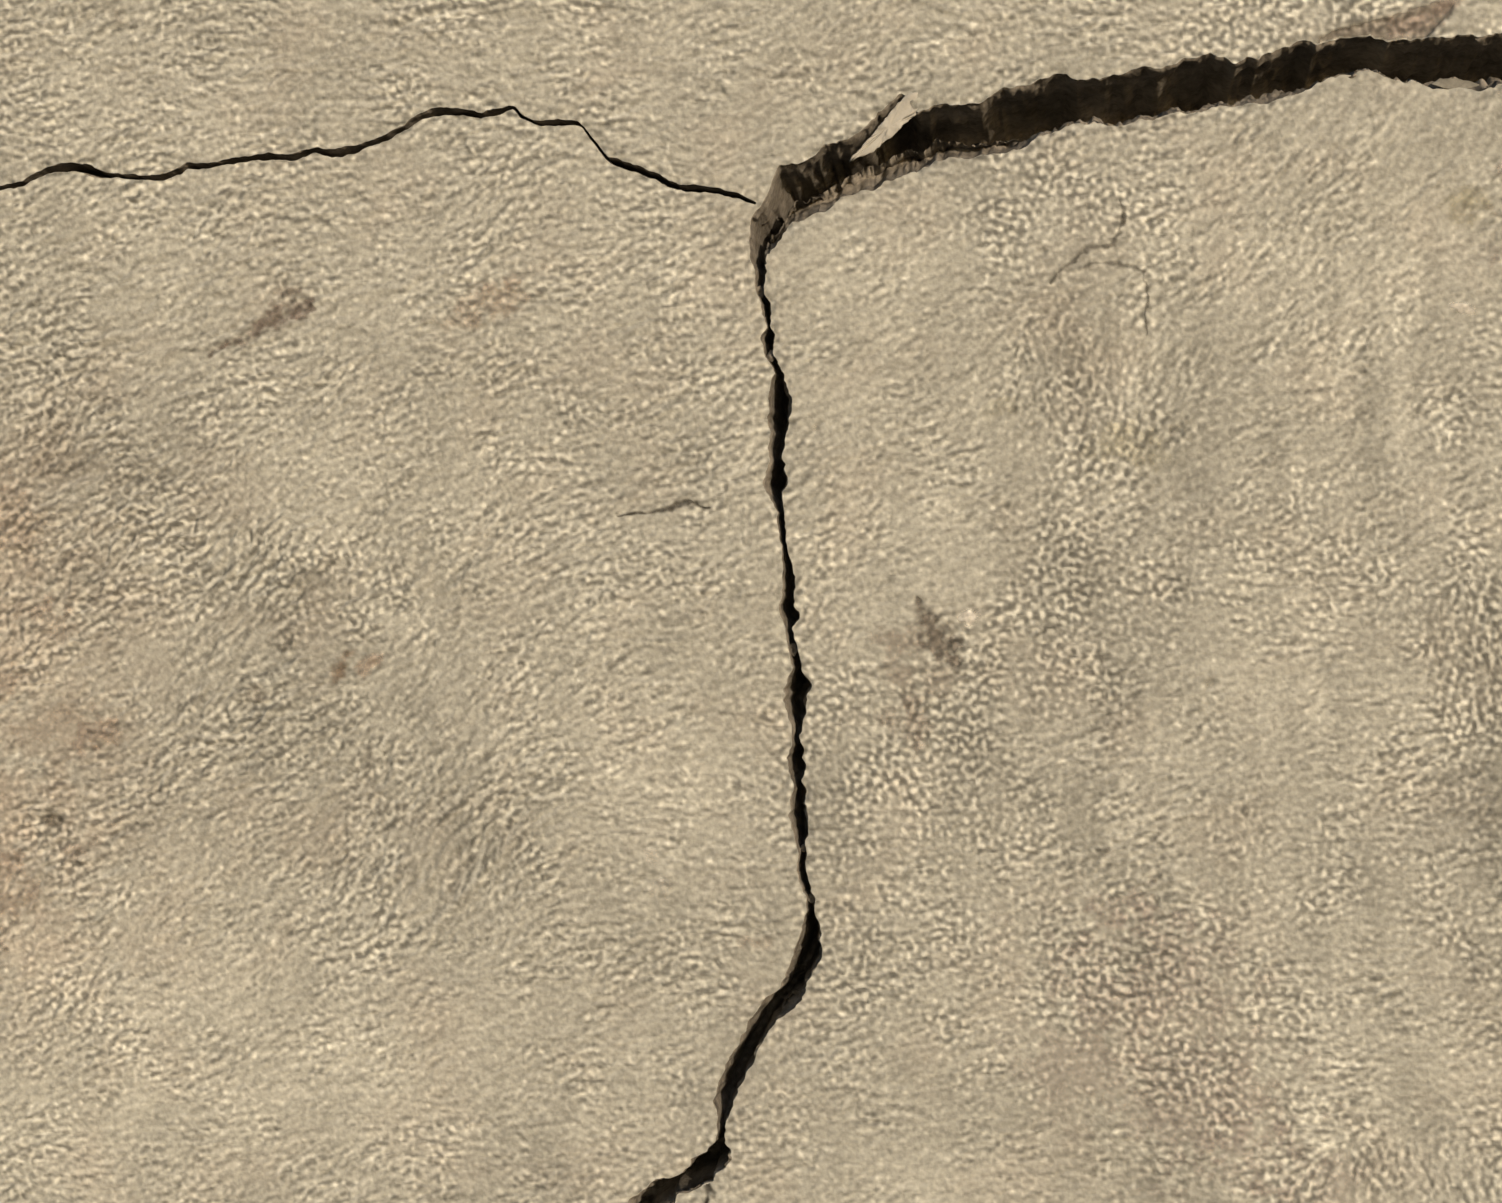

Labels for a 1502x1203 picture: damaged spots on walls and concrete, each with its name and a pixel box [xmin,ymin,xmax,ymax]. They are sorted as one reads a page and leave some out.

crack [0,106,756,204]
crack [618,1,1502,1203]